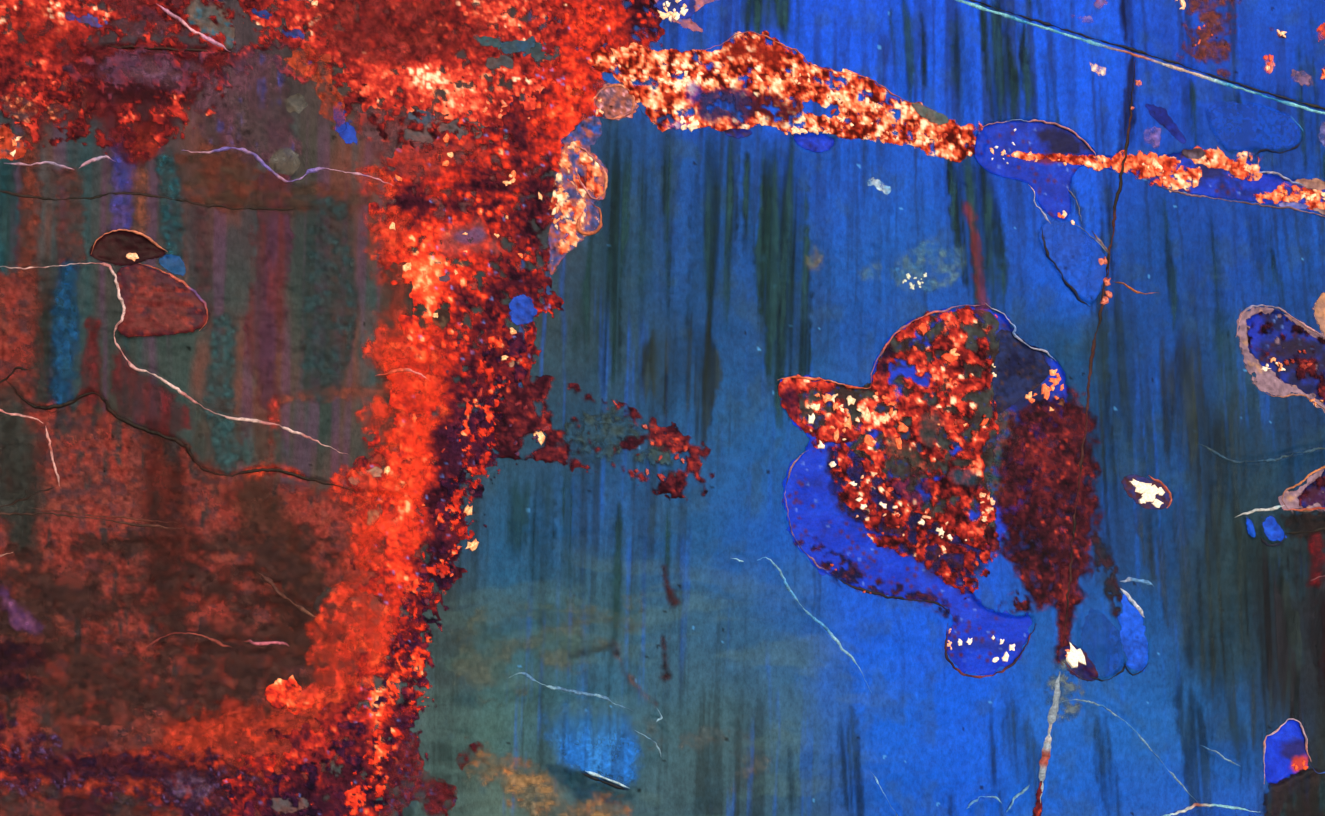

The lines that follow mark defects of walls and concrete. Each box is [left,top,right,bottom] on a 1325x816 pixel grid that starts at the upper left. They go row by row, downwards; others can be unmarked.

corrosion [1263,54,1275,75]
crack [0,147,393,211]
corrosion [1076,146,1325,217]
crack [0,262,347,454]
corrosion [0,0,984,816]
peeling [778,303,1069,678]
corrosion [977,389,1123,663]
crack [966,60,1198,816]
peeling [1121,474,1172,510]
peeling [1236,292,1325,413]
crack [732,557,872,693]
peeling [1163,718,1325,816]